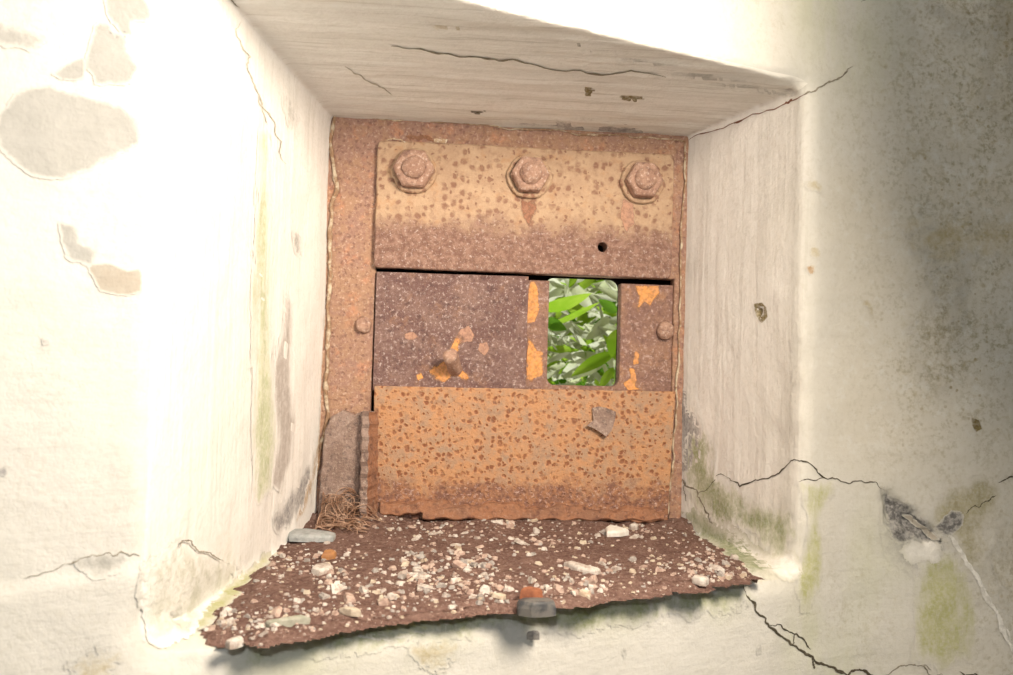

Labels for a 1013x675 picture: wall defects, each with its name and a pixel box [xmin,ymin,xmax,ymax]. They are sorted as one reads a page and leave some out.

crack [231,0,284,162]
crack [345,66,392,95]
crack [391,46,664,77]
crack [689,66,853,140]
corrosion [521,200,536,224]
corrosion [456,325,489,356]
water stain [272,465,314,535]
crack [682,459,880,524]
spalling [876,486,964,577]
water stain [928,474,1013,653]
crack [743,585,978,675]